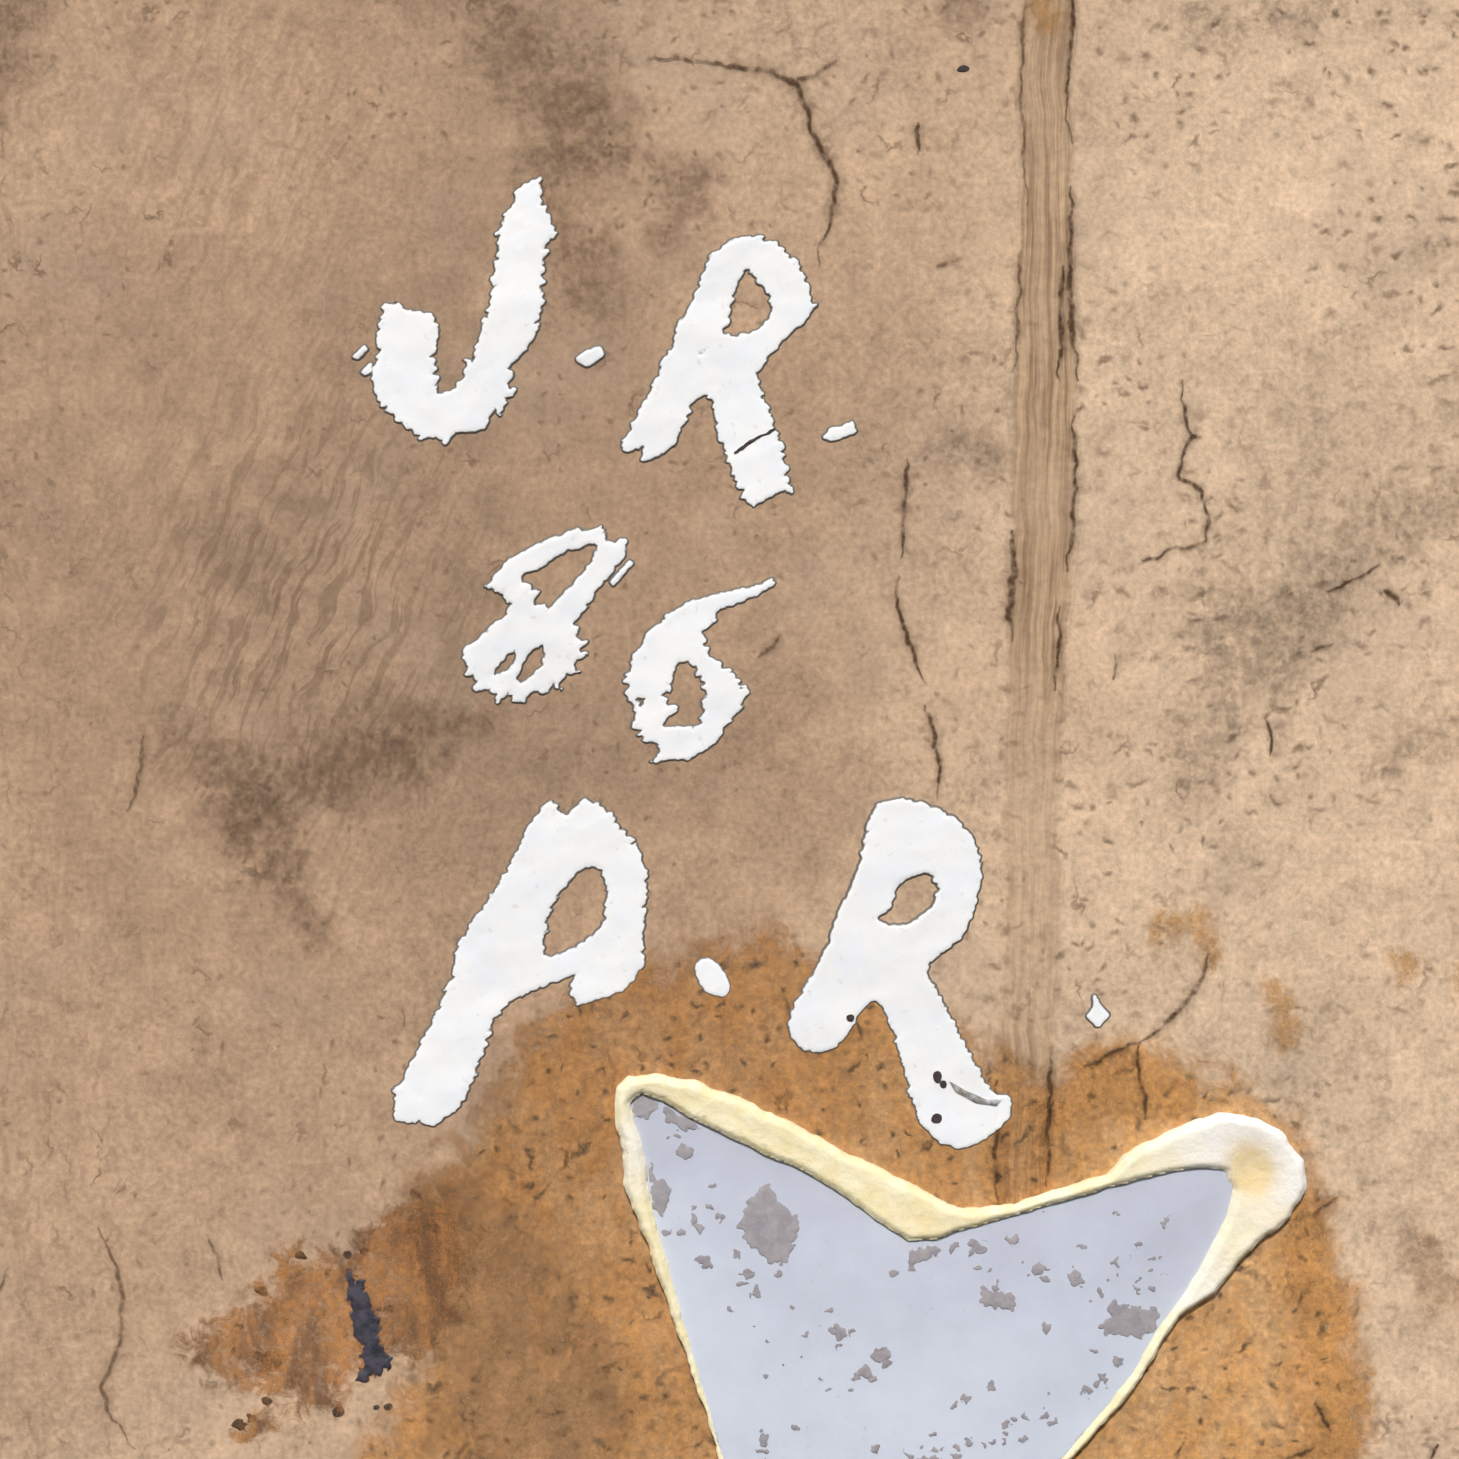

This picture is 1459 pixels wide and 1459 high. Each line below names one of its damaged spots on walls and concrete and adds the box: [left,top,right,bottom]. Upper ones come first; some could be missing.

crack [655,57,839,262]
crack [1056,187,1079,381]
crack [1143,379,1210,561]
crack [895,462,942,783]
crack [1005,530,1018,641]
peeling [632,1094,700,1160]
peeling [648,1162,800,1299]
rust [183,933,1372,1459]
peeling [818,1346,892,1392]
peeling [903,1391,1058,1459]
peeling [889,1233,1167,1399]
crack [1045,953,1209,1186]